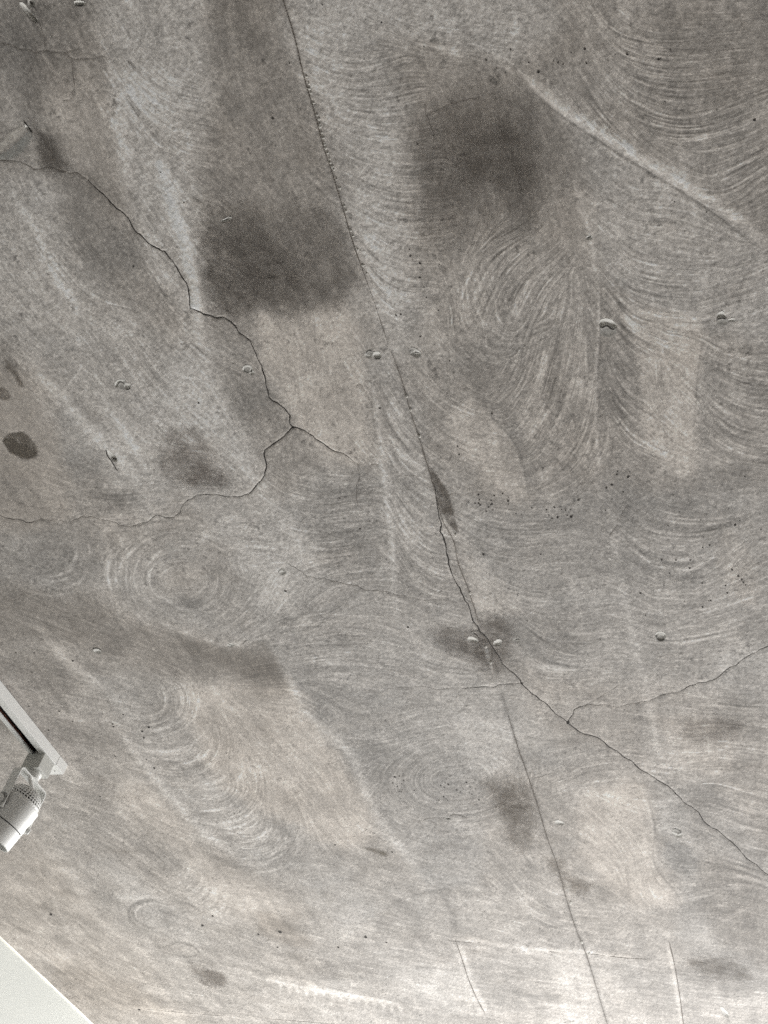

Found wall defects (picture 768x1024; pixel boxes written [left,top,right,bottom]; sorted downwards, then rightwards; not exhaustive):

damp [3,432,36,458]
crack [0,160,377,527]
damp [431,472,457,531]
crack [286,475,768,875]